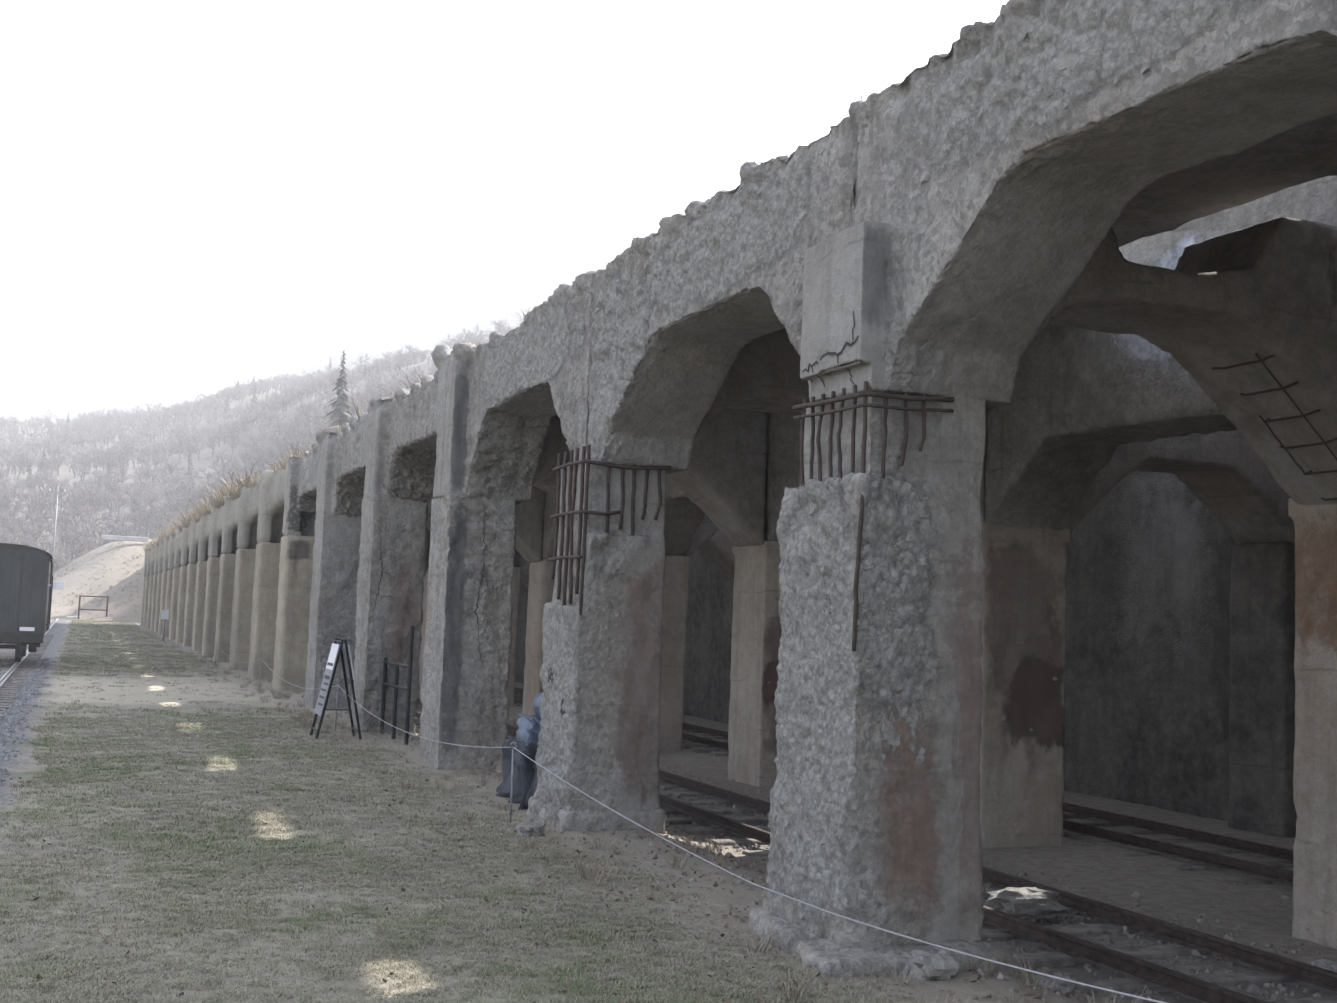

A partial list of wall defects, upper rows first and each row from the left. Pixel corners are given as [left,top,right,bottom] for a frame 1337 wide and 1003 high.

spalling [478,149,824,812]
crack [802,311,858,387]
spalling [763,381,954,953]
spalling [1212,353,1337,475]